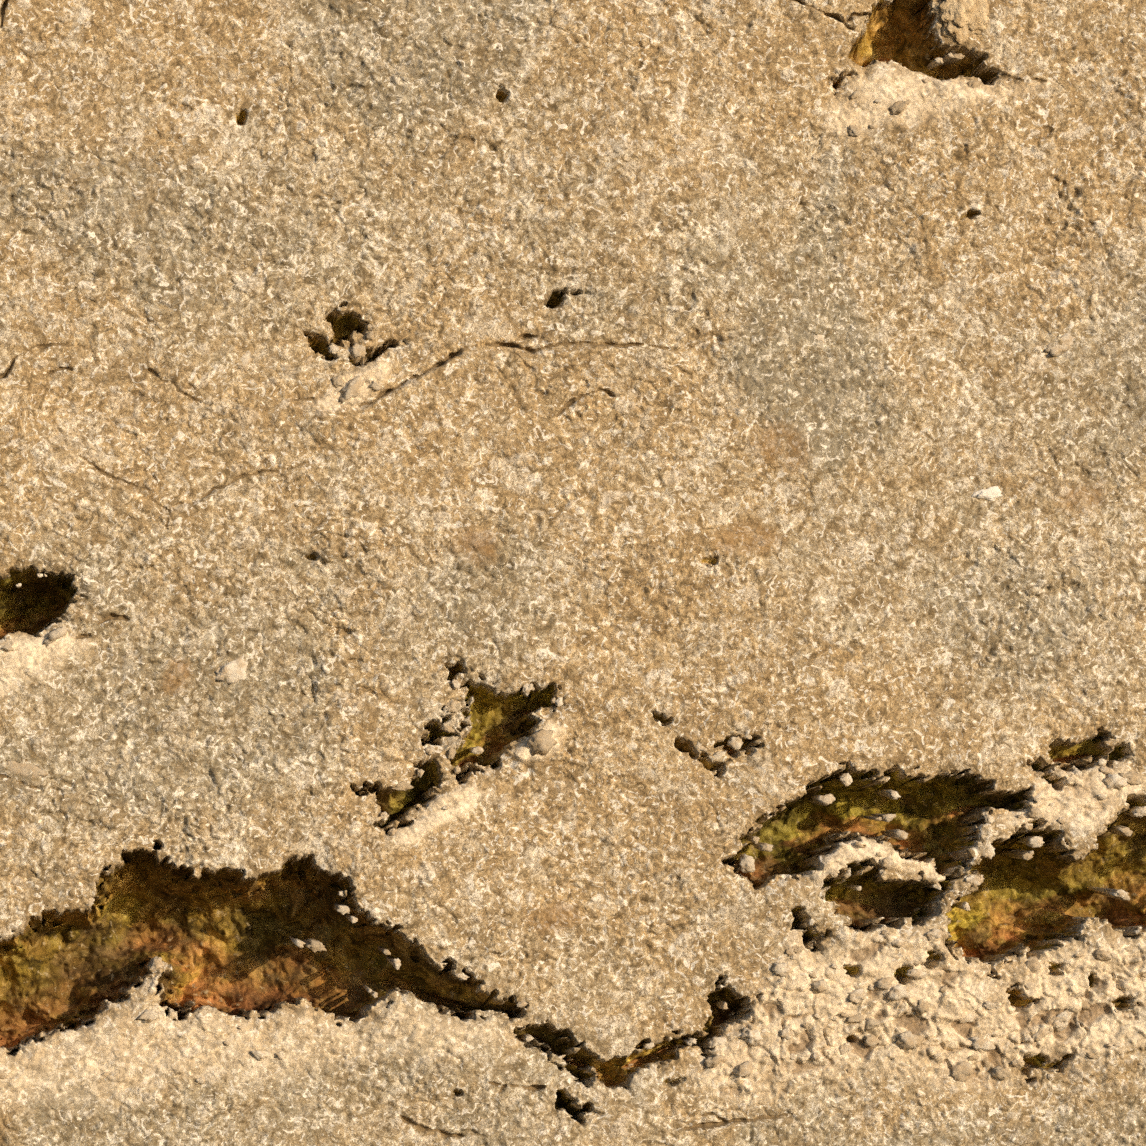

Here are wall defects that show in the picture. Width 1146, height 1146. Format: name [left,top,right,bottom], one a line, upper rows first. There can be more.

crack [0,0,8,28]
crack [792,0,868,30]
spalling [826,0,1052,141]
spalling [304,305,396,413]
crack [359,333,669,407]
crack [556,389,616,417]
spalling [0,566,79,701]
spalling [350,664,567,849]
spalling [0,842,528,1110]
spalling [664,732,1146,1107]